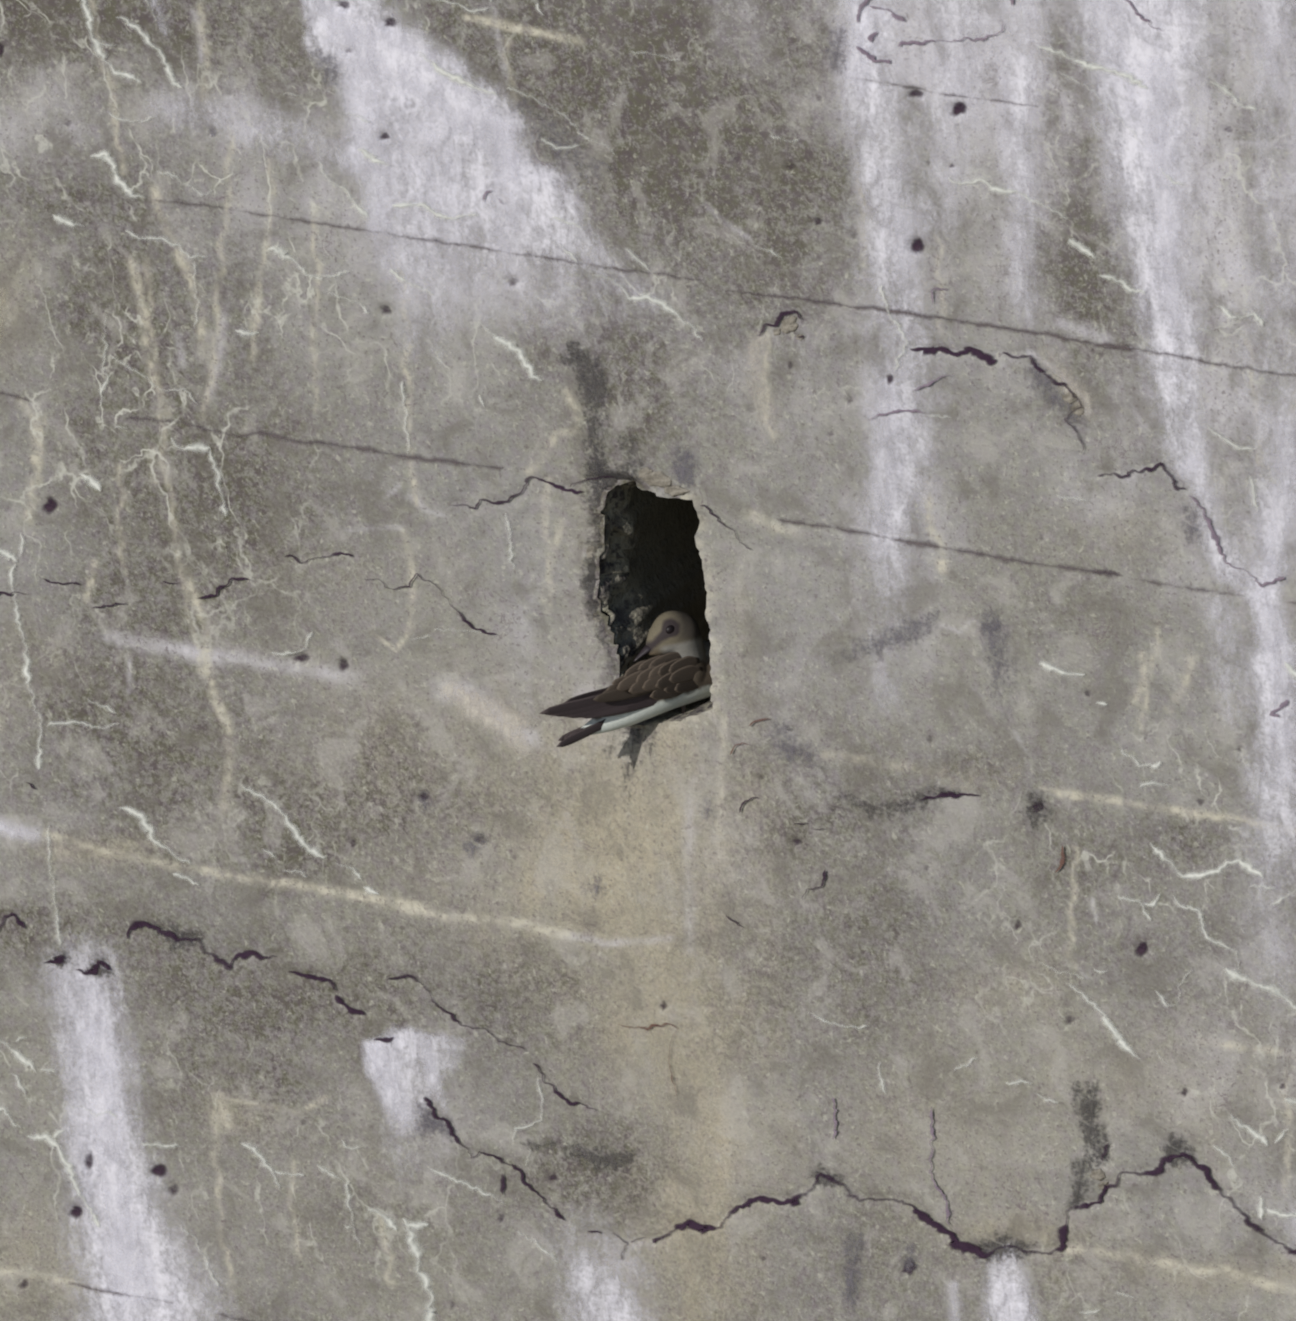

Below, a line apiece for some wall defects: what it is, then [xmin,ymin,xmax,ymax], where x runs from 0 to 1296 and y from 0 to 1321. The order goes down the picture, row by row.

damp [304,0,601,303]
crack [467,476,612,559]
spalling [638,467,690,497]
crack [867,286,1284,587]
damp [1079,0,1296,861]
crack [285,552,496,635]
crack [44,918,111,975]
crack [126,921,393,1042]
damp [56,947,207,1321]
damp [364,1029,452,1137]
crack [423,1097,1296,1259]
damp [974,1233,1036,1321]